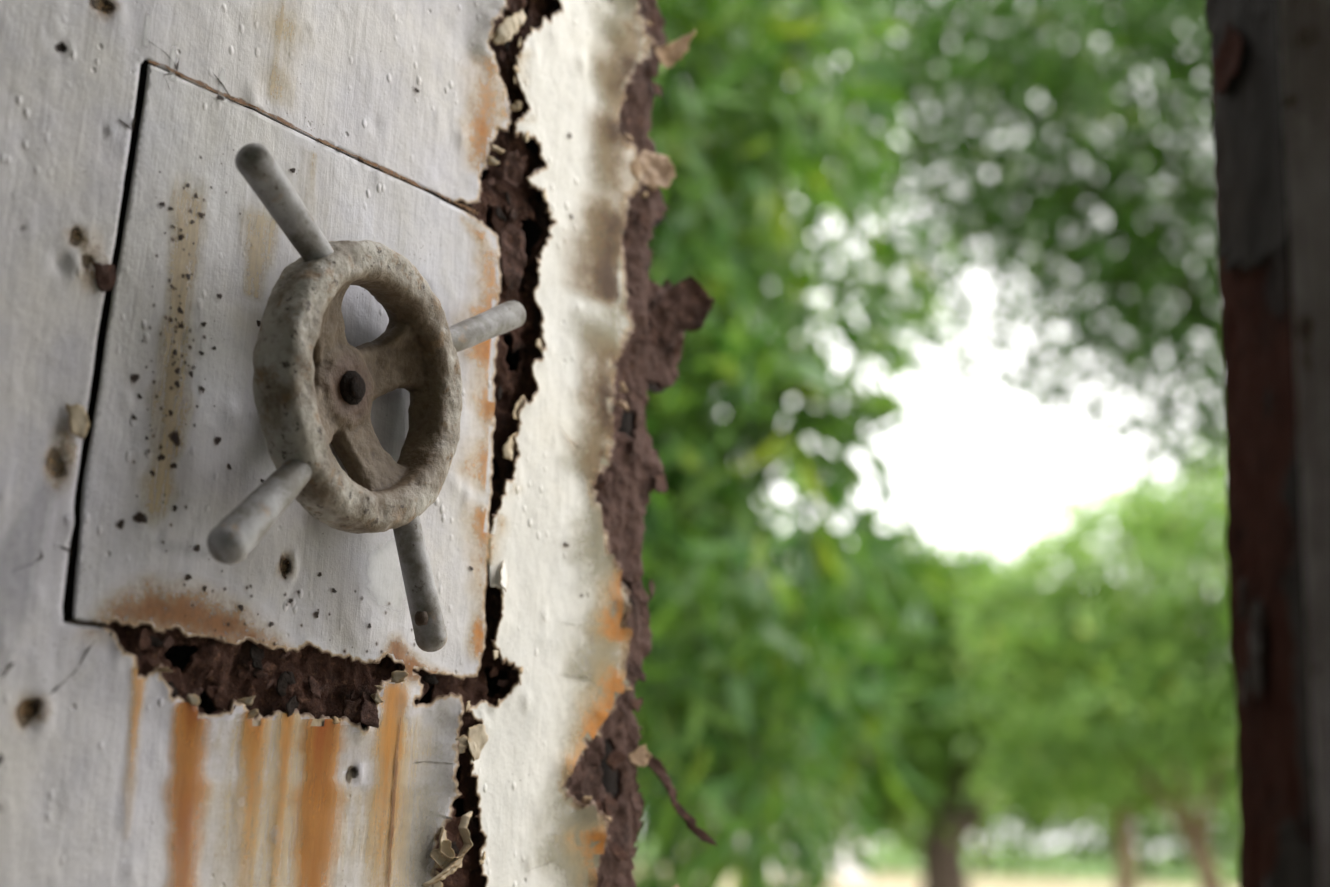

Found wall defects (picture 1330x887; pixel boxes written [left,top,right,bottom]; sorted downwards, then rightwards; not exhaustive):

corrosion [159,183,227,256]
corrosion [130,274,216,477]
crack [13,41,479,695]
corrosion [116,495,147,529]
corrosion [91,574,287,651]
corrosion [130,669,145,771]
corrosion [170,702,207,887]
spalling [99,622,441,728]
corrosion [226,711,341,887]
crack [415,758,452,766]